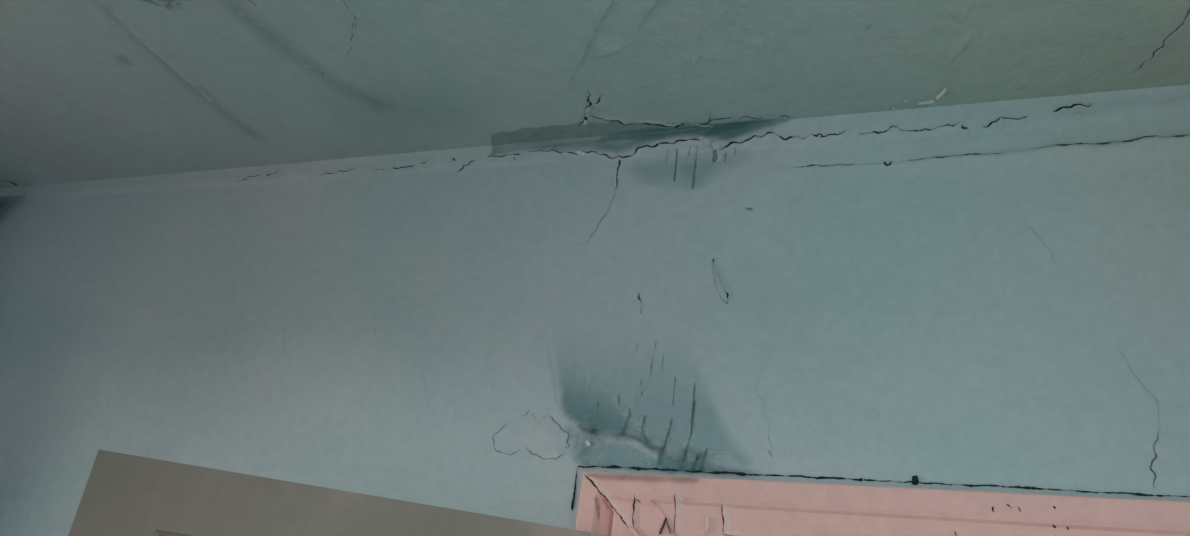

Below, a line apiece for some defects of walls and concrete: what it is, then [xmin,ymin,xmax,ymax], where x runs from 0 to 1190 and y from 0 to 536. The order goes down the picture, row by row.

peeling [579,90,684,128]
crack [571,428,1190,531]
peeling [626,491,684,536]